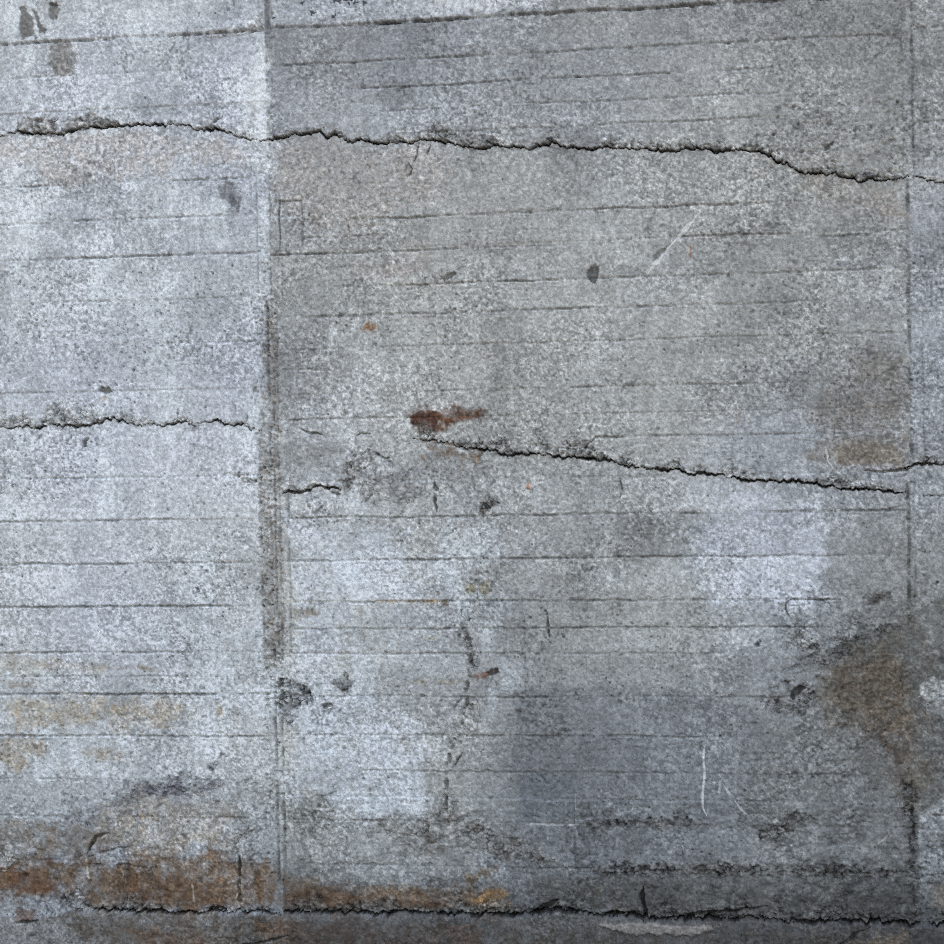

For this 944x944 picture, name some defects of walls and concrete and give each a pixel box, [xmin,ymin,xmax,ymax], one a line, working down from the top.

crack [0,116,944,184]
crack [278,199,304,250]
crack [0,394,261,431]
crack [283,433,392,503]
crack [432,482,440,513]
corrosion [405,401,490,470]
crack [410,415,944,497]
damp [510,588,944,935]
corrosion [0,782,915,944]
crack [285,905,944,929]